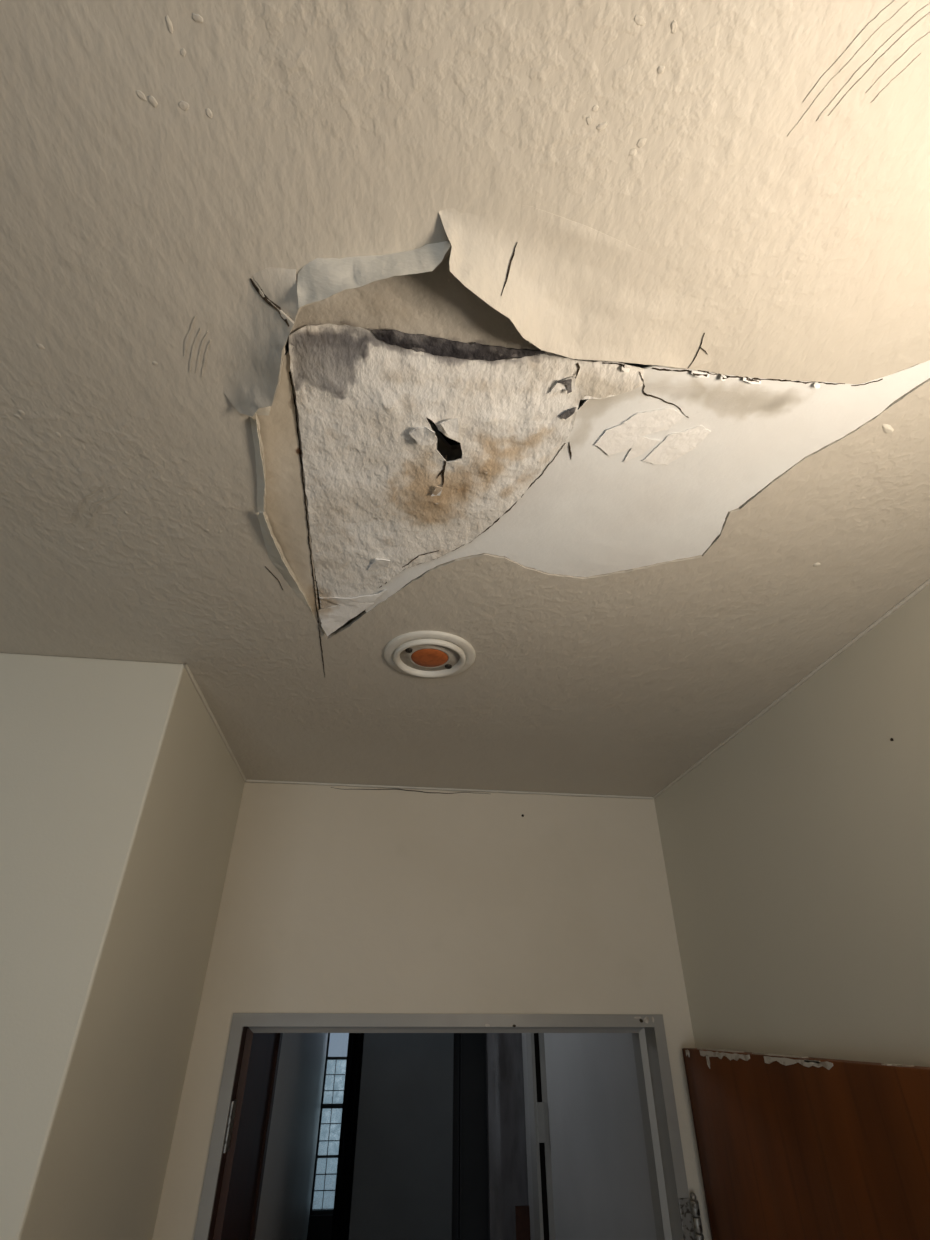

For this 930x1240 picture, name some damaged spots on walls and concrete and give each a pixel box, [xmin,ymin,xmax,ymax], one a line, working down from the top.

crack [289,372,325,675]
spalling [250,241,930,636]
peeling [685,1050,833,1070]